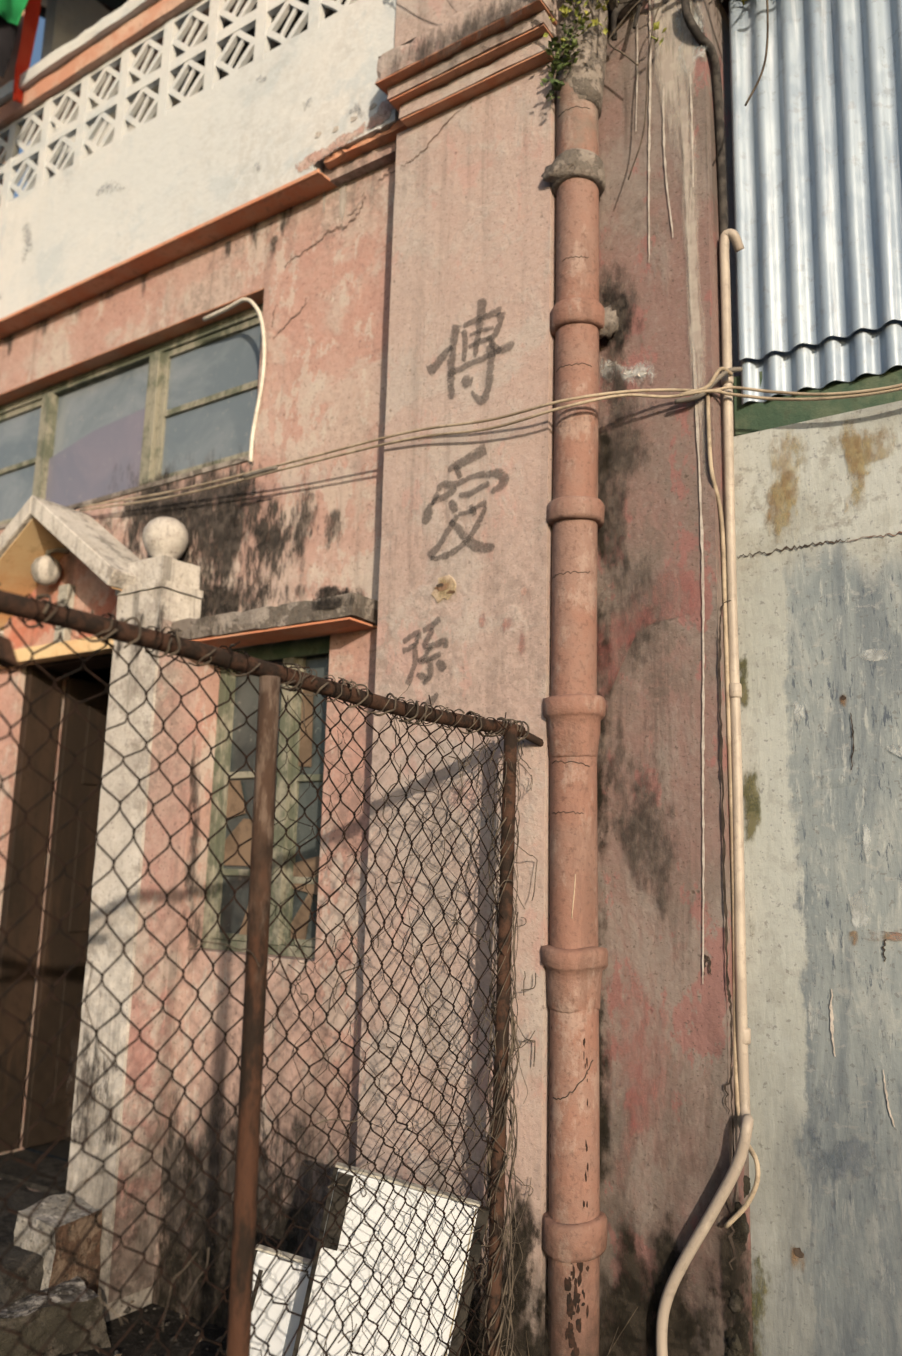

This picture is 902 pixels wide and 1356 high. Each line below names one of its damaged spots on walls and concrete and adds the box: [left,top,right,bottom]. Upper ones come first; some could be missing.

peeling [295,99,395,172]
crack [284,96,475,267]
crack [272,297,307,339]
leakage [100,455,340,618]
leakage [597,715,610,850]
leakage [599,1006,610,1182]
leakage [599,1217,729,1356]